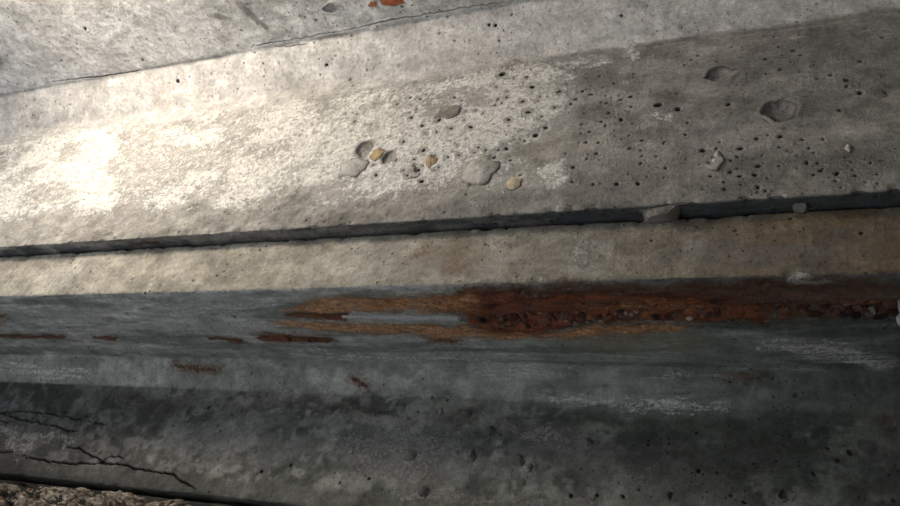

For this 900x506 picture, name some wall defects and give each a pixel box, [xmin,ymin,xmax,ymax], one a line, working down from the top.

spalling [787,272,836,285]
corrosion [257,278,900,343]
spalling [479,306,736,329]
spalling [763,299,899,320]
crack [0,407,198,499]
spalling [0,483,191,506]